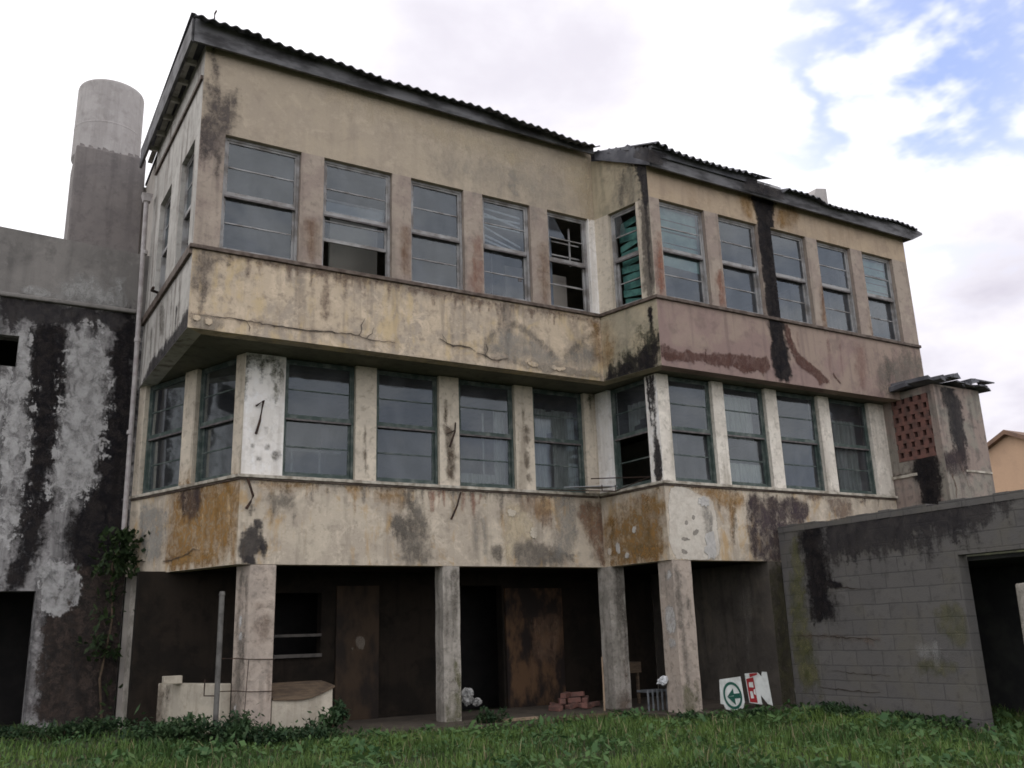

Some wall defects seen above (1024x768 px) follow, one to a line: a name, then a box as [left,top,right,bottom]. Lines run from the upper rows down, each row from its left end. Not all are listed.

water stain [200,48,237,176]
crack [191,313,395,343]
crack [441,334,516,362]
water stain [604,146,840,481]
water stain [0,277,188,729]
corrosion [166,480,239,570]
water stain [239,510,267,564]
water stain [392,488,431,565]
corrosion [580,493,667,566]
peeling [668,486,720,560]
water stain [733,387,1011,705]